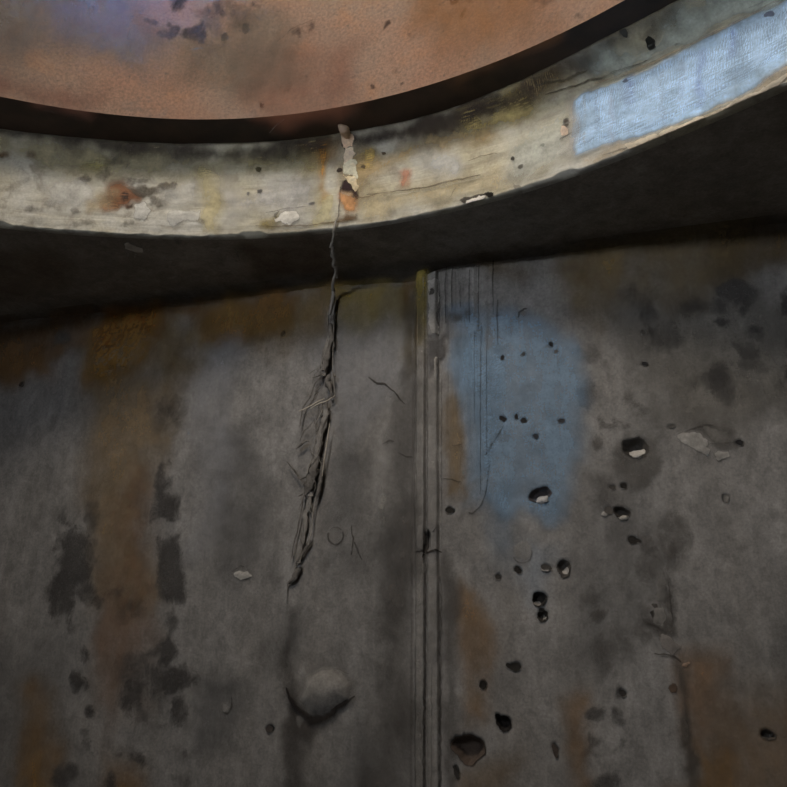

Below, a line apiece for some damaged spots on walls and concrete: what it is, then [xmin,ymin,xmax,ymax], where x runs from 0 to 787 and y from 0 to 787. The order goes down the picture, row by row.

rust [102,182,141,211]
spalling [460,192,493,203]
spalling [255,206,353,227]
spalling [622,437,649,459]
spalling [677,423,735,461]
water stain [153,464,180,521]
spalling [528,486,552,504]
water stain [48,527,96,616]
water stain [157,535,185,603]
water stain [123,637,196,722]
spalling [450,734,486,766]